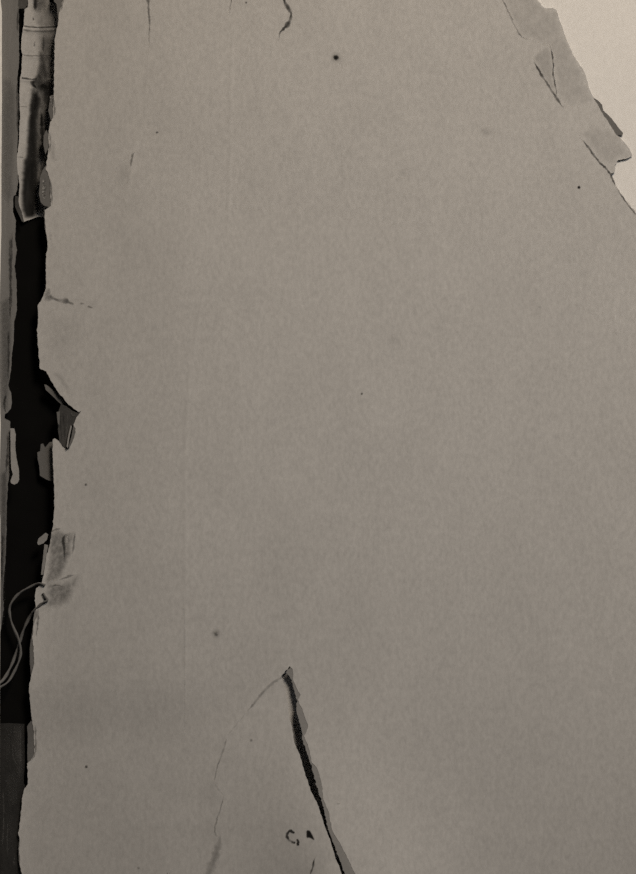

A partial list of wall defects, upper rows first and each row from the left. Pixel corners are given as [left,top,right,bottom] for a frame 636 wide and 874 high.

crack [280,0,292,32]